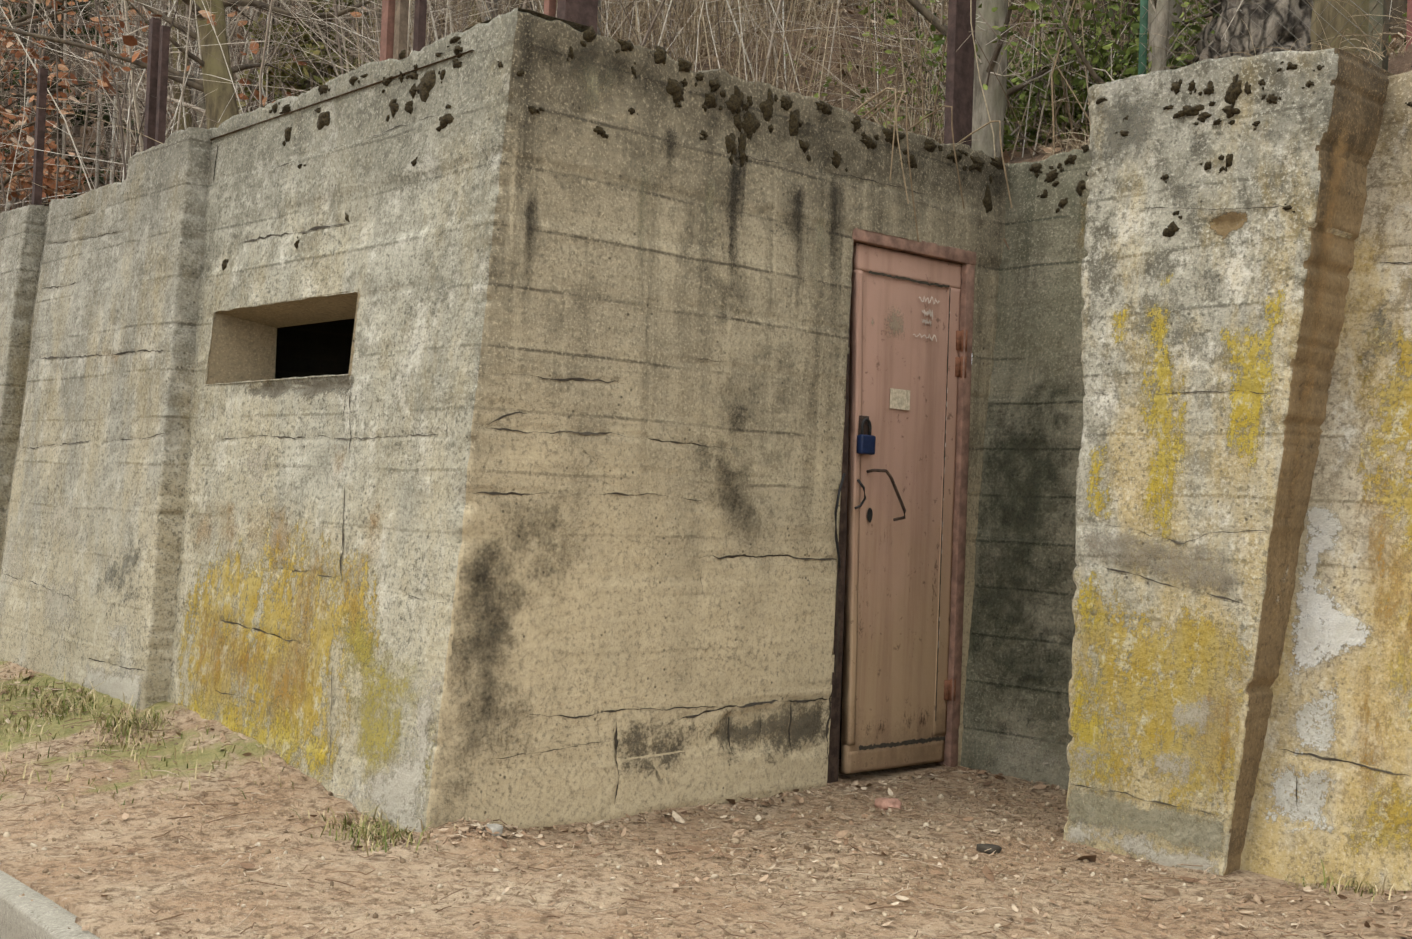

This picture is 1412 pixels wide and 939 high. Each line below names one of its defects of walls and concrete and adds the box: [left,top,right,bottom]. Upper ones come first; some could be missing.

water stain [527,203,537,255]
water stain [707,152,744,255]
water stain [793,183,843,275]
spalling [1209,211,1248,240]
water stain [452,546,518,741]
crack [495,554,839,799]